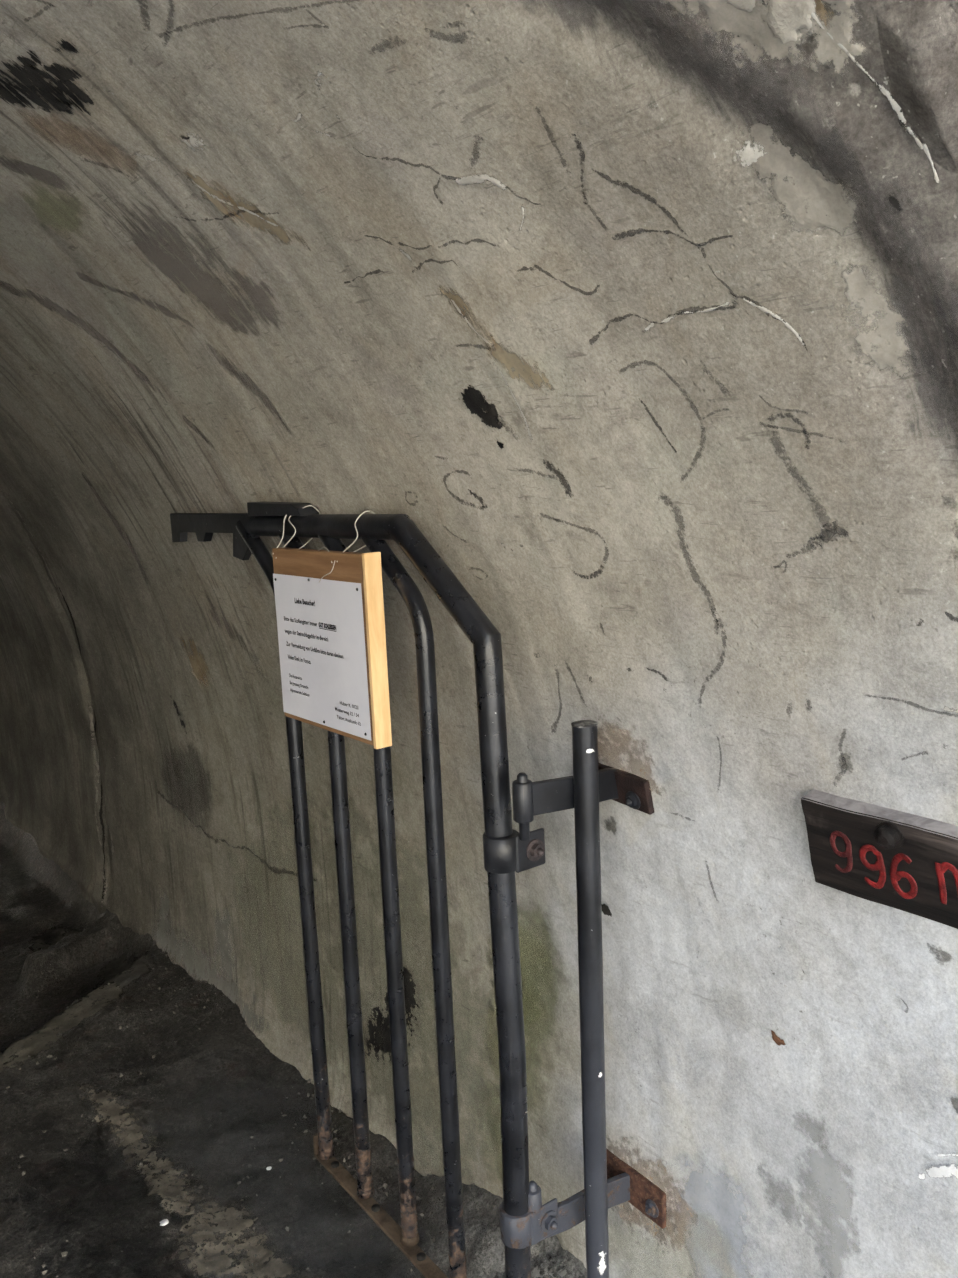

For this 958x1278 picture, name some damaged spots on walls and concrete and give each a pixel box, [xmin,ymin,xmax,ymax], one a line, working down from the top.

spalling [660,0,864,73]
crack [810,12,939,183]
crack [344,150,539,284]
crack [517,265,600,295]
crack [589,245,807,350]
crack [157,789,316,881]